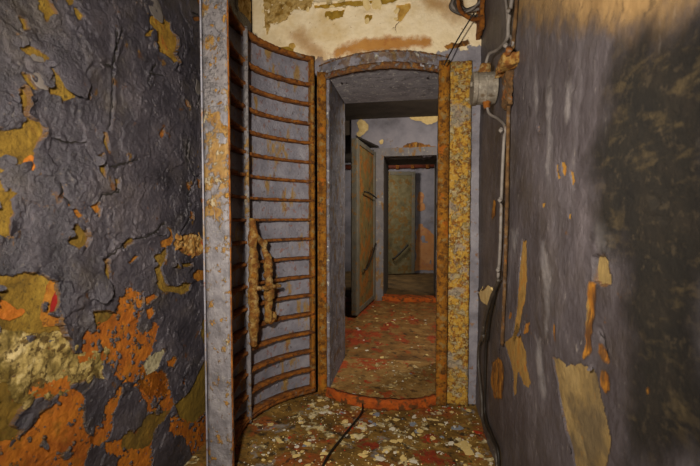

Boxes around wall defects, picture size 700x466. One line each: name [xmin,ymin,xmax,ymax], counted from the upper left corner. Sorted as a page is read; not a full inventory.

peeling [145,0,182,70]
spalling [262,0,411,34]
water stain [518,0,681,23]
peeling [0,17,75,172]
corrosion [325,61,439,80]
peeling [0,169,21,237]
spalling [66,203,100,254]
spalling [598,256,612,284]
water stain [592,19,700,461]
spalling [0,227,206,466]
peeling [505,239,531,396]
peeling [554,358,611,466]